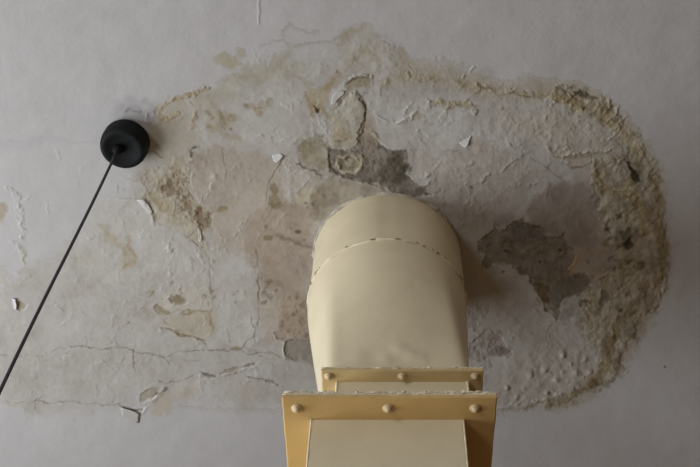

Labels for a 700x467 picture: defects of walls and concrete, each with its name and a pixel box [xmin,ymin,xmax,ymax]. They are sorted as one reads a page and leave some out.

crack [0,210,282,372]
damp [0,45,341,416]
peeling [261,279,314,367]
flaking render [293,134,430,222]
damp [292,22,674,415]
flaking render [477,216,593,326]
peeling [120,373,204,423]